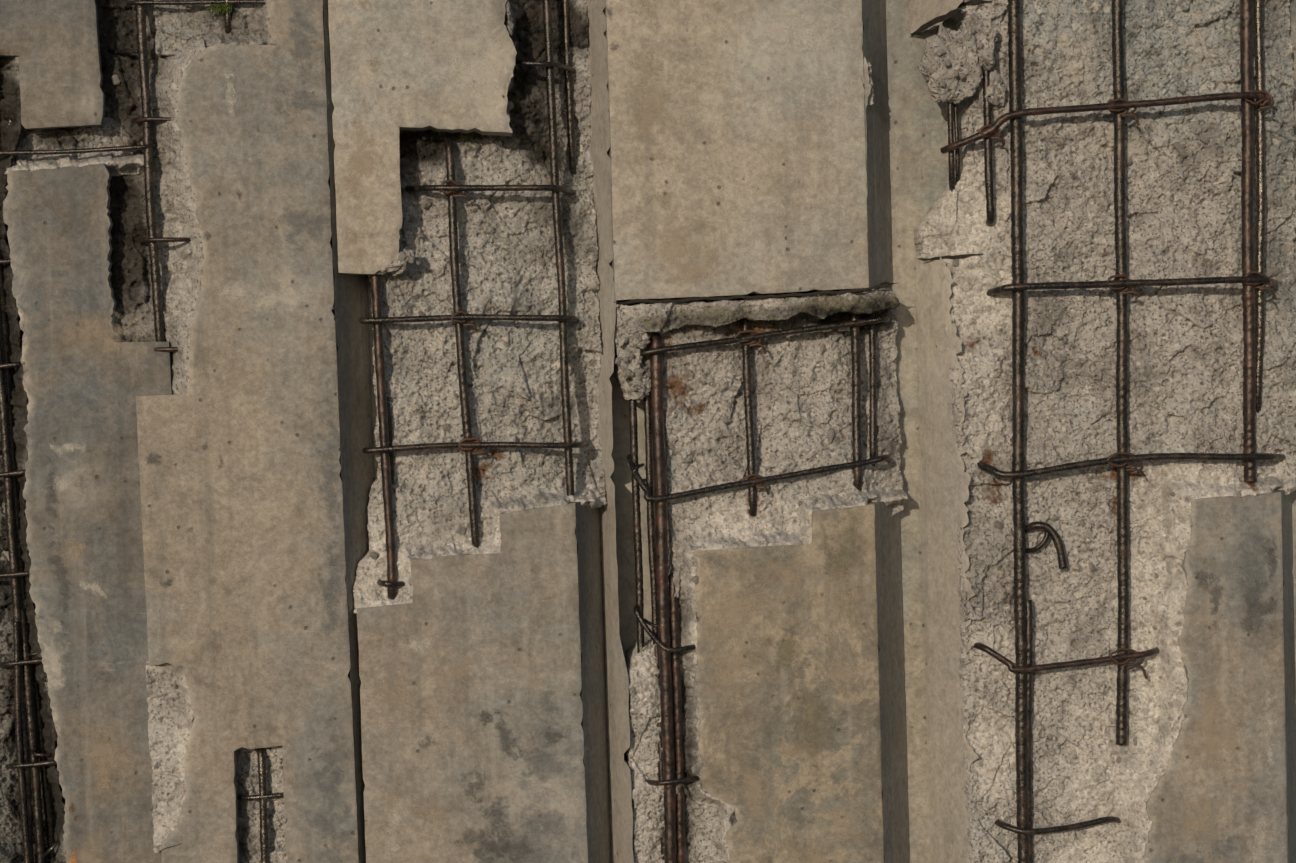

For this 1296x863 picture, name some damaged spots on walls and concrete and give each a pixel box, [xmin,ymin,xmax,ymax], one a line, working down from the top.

spalling [236,746,288,863]
spalling [353,0,908,863]
corrosion [664,375,704,414]
spalling [913,0,1296,863]